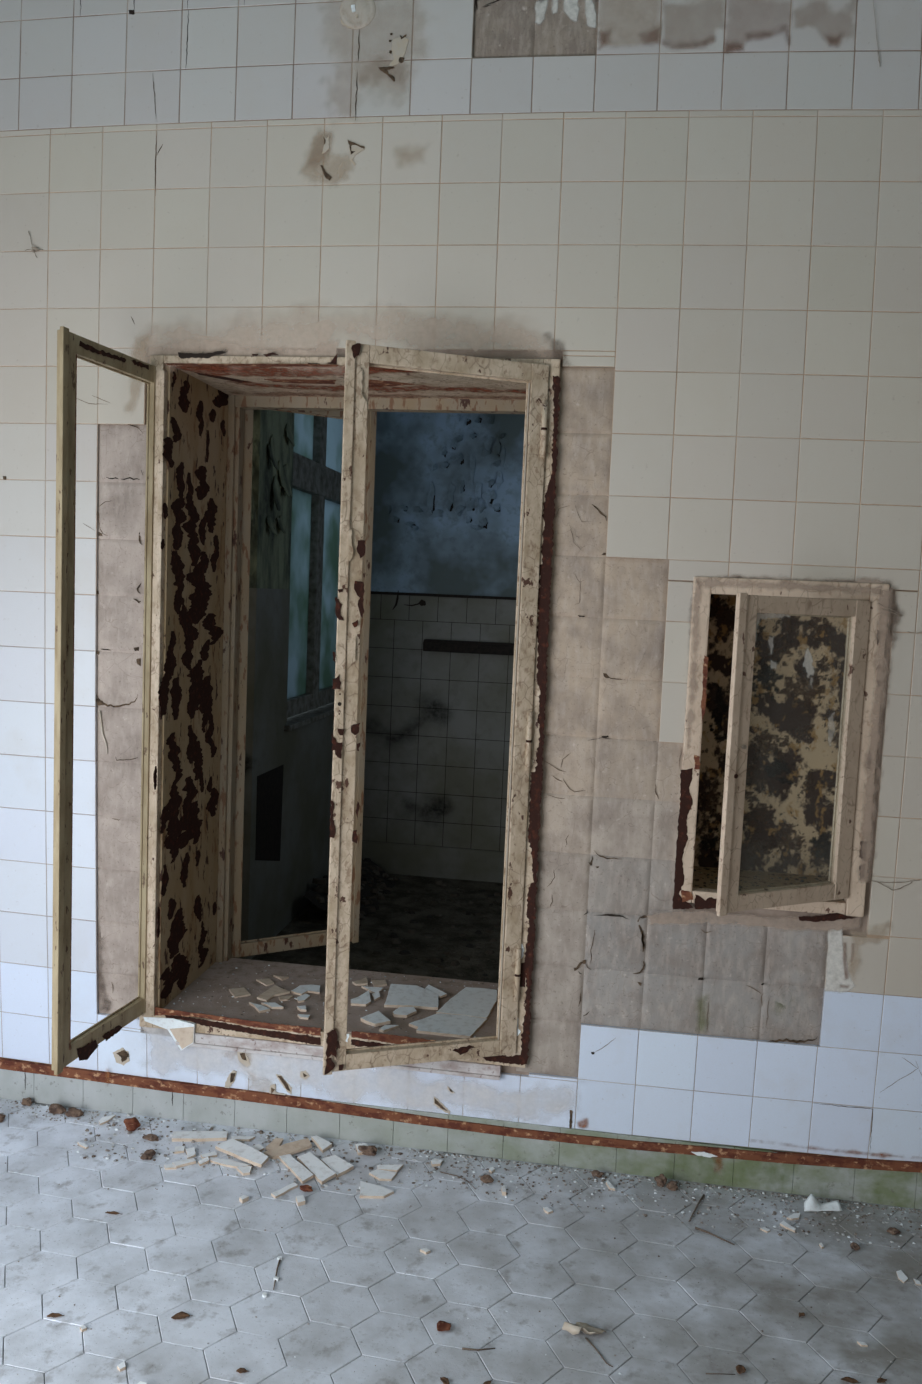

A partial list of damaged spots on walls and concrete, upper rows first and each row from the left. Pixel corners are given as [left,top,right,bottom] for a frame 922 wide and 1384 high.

peeling [473,0,598,58]
peeling [97,371,229,1014]
rust [453,376,561,1065]
peeling [516,367,840,1077]